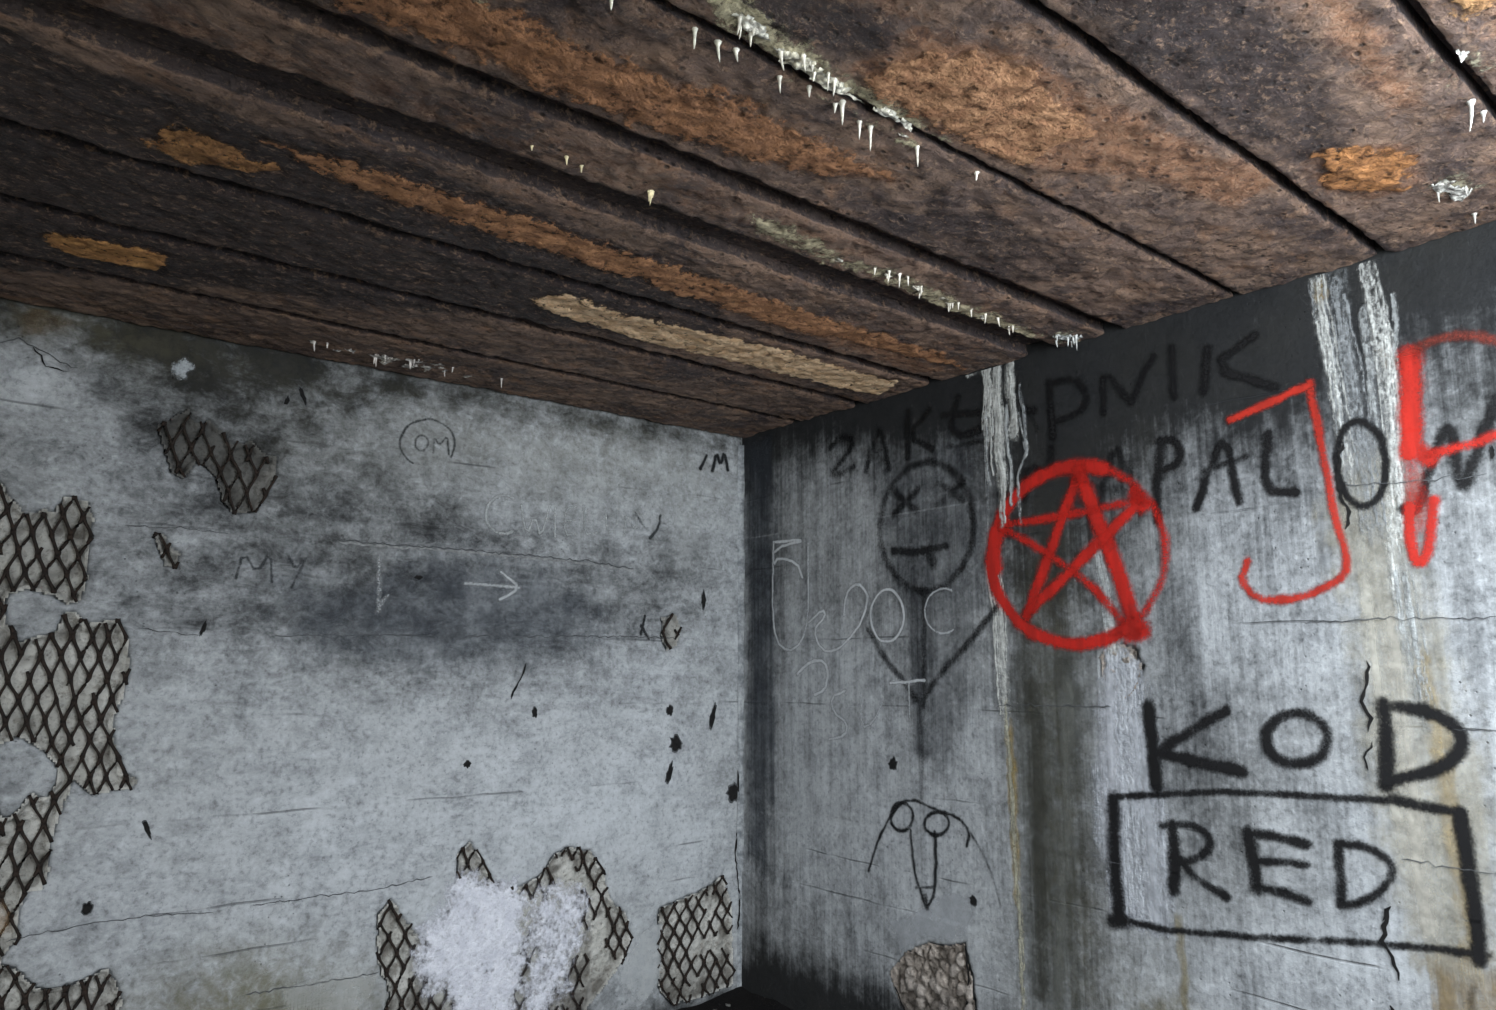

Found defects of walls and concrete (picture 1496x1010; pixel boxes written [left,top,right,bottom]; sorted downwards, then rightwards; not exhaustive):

leakage [708,0,950,166]
leakage [172,358,193,378]
leakage [309,340,472,378]
spalling [157,409,278,515]
leakage [1308,261,1473,944]
spalling [0,484,137,1010]
spalling [376,899,456,1010]
leakage [411,871,589,1010]
spalling [447,842,634,1010]
spalling [657,875,736,1007]
crack [1379,906,1400,1010]
crack [1401,859,1496,874]